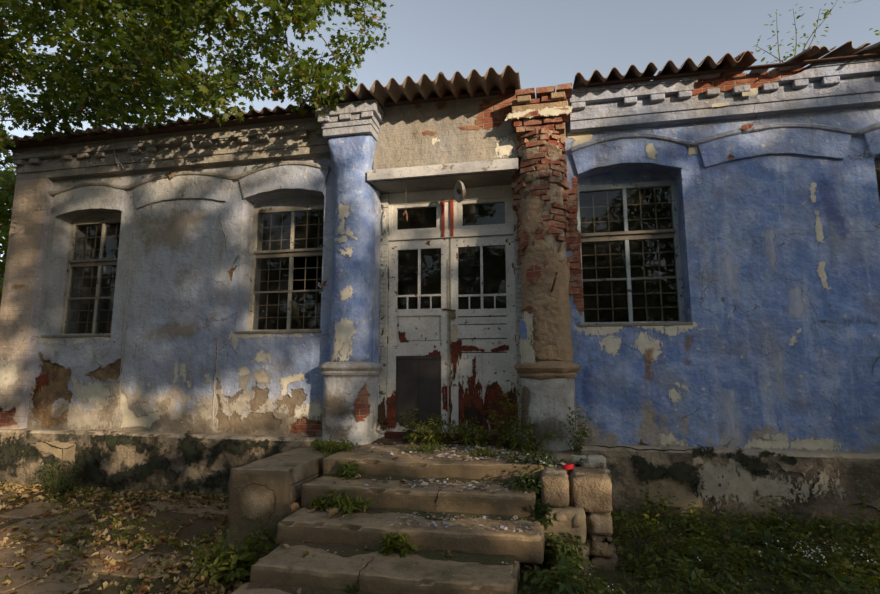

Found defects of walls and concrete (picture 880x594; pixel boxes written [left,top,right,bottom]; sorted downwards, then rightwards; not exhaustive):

peeling [456,94,516,159]
peeling [567,132,592,147]
peeling [334,201,358,257]
peeling [570,177,584,314]
peeling [0,408,18,428]
peeling [0,356,21,395]
peeling [28,337,163,431]
peeling [194,349,322,436]
water stain [0,428,269,488]